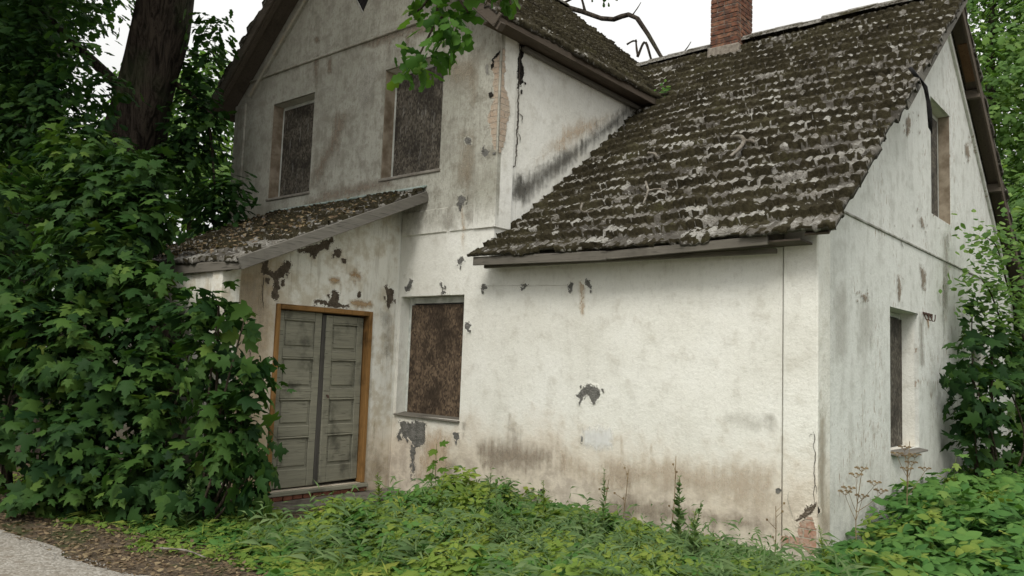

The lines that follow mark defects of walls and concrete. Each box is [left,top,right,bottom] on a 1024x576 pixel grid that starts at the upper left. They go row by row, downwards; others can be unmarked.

flaking render [462,42,526,161]
crack [513,44,523,167]
spalling [258,235,346,306]
spalling [309,286,363,310]
spalling [382,275,415,310]
spalling [479,281,491,294]
spalling [564,274,595,296]
spalling [573,378,605,408]
spalling [395,417,429,481]
water stain [480,445,544,465]
crack [787,432,817,513]
flaking render [781,496,822,561]